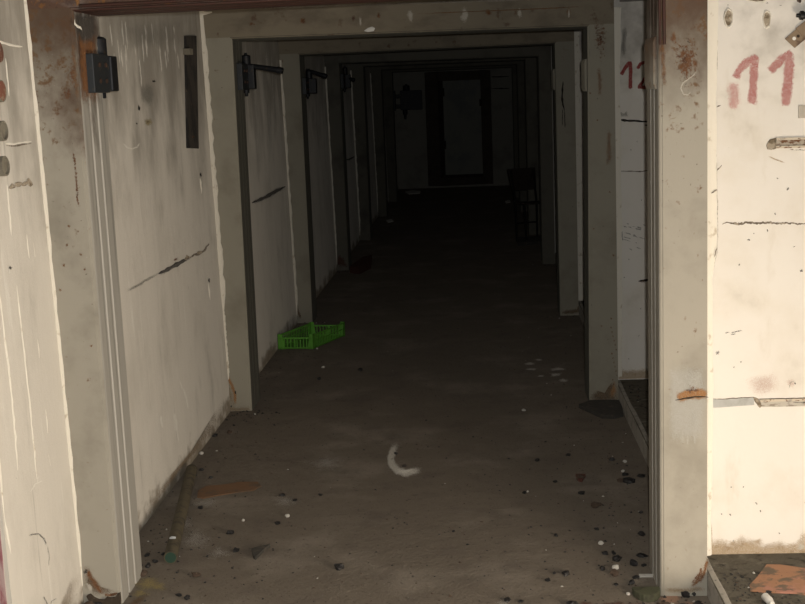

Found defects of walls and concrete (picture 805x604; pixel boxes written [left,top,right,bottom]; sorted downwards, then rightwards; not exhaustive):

corrosion [61,0,100,107]
corrosion [660,31,700,87]
crack [252,186,285,203]
crack [712,189,805,266]
crack [129,244,209,291]
damp [711,529,805,555]
spalling [86,592,121,604]